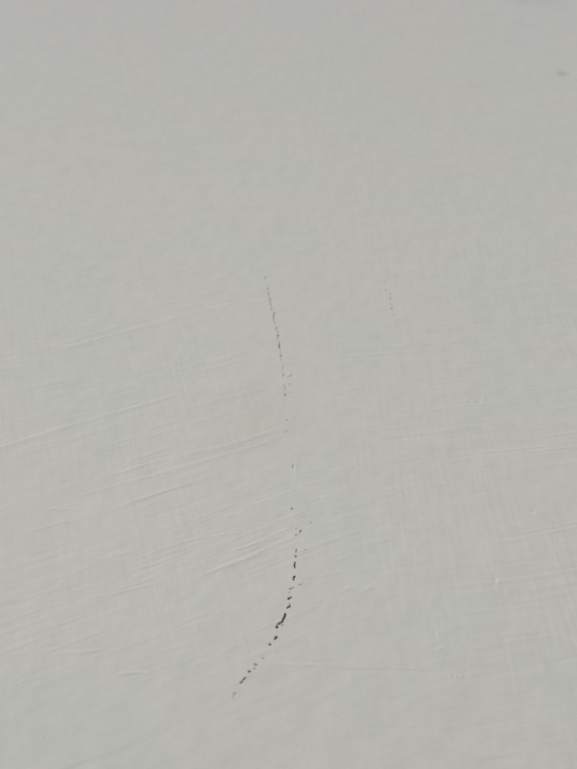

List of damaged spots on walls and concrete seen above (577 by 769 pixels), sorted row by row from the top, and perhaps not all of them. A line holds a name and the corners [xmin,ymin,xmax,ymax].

crack [265,276,295,432]
crack [232,465,312,698]